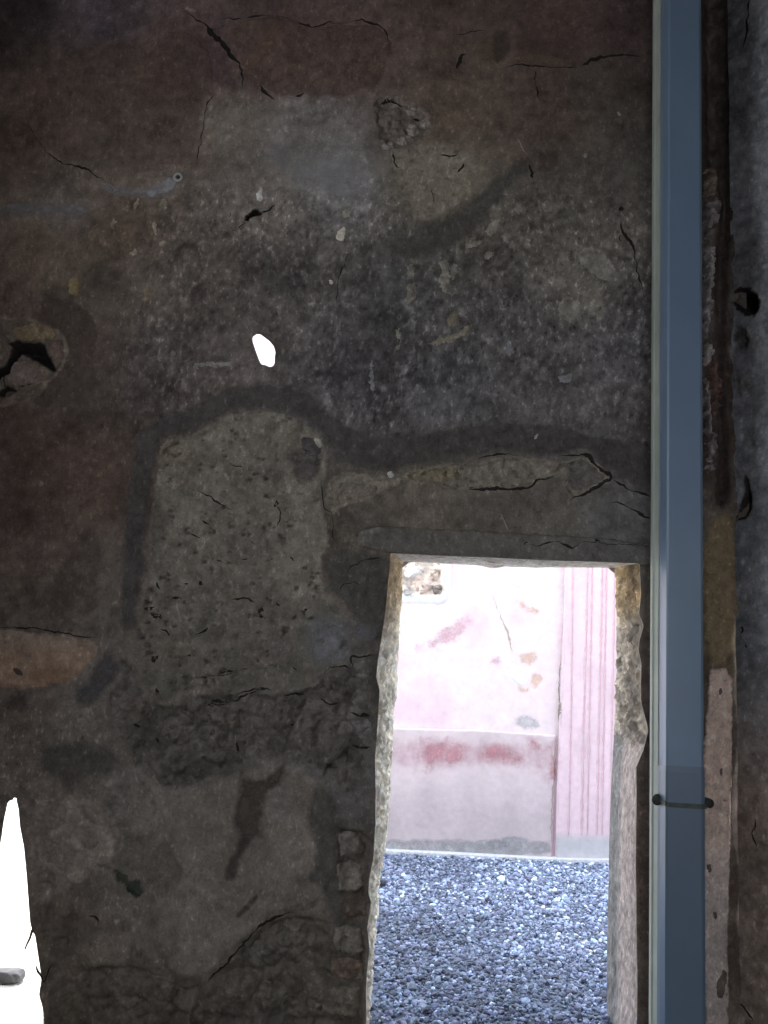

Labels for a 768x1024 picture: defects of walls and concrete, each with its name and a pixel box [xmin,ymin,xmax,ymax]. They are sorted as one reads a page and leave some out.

crack [180,7,395,166]
crack [494,53,649,100]
crack [24,108,114,188]
flaking render [369,94,476,228]
crack [238,204,277,230]
crack [618,205,650,312]
spalling [0,313,71,409]
crack [461,452,651,519]
crack [522,538,651,550]
crack [0,626,99,639]
crack [203,911,296,986]